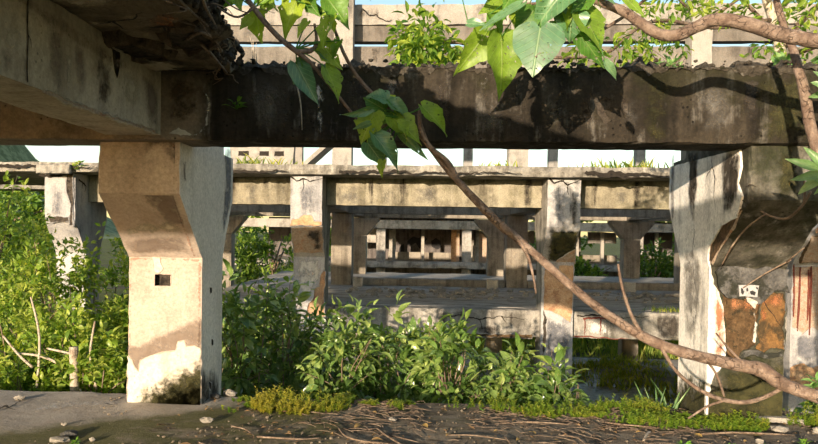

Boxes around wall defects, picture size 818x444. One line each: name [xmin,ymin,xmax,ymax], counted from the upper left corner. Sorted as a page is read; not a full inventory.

crack [25,0,33,82]
spalling [102,0,245,79]
water stain [688,154,697,215]
water stain [722,154,738,210]
spalling [290,214,324,254]
spalling [709,209,743,264]
spalling [307,269,326,318]
crack [447,314,524,327]
spalling [460,249,576,356]
spalling [722,226,818,359]
spalling [789,362,818,390]